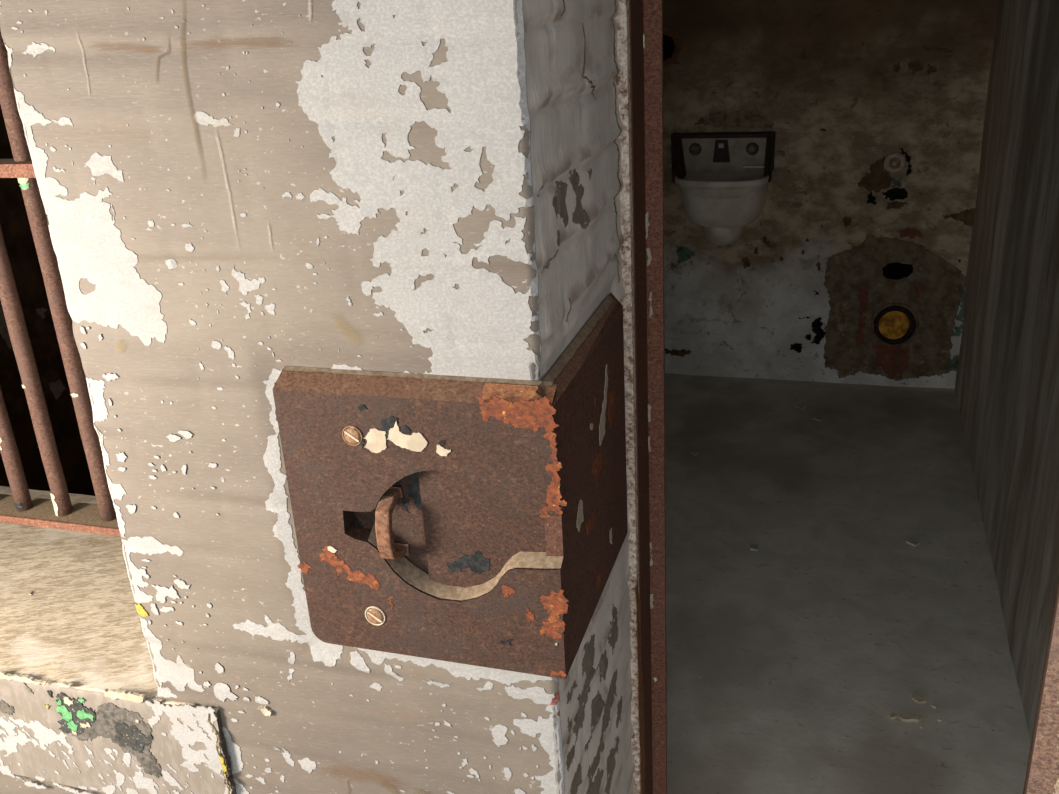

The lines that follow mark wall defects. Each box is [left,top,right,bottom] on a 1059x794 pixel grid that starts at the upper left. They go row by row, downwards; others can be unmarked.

peeling [0,300,13,351]
peeling [3,42,167,349]
peeling [197,339,243,380]
peeling [165,231,276,327]
peeling [282,0,592,381]
spalling [882,262,913,280]
peeling [233,336,622,794]
rust [635,584,646,794]